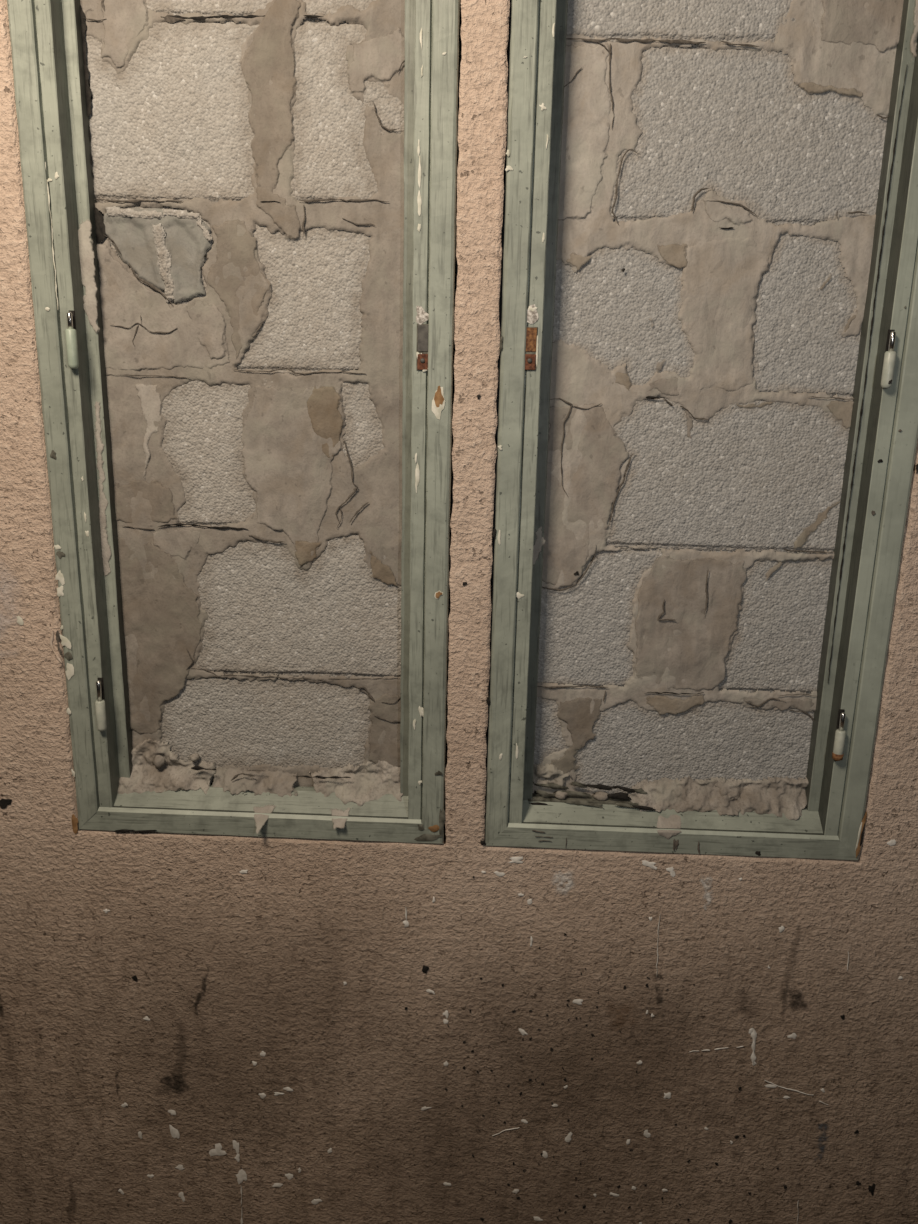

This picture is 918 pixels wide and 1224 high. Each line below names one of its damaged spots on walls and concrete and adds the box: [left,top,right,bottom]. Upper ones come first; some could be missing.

peeling [45,162,59,311]
spalling [103,206,212,304]
peeling [416,306,429,325]
peeling [54,545,65,597]
peeling [50,625,74,680]
peeling [529,782,656,810]
damp [748,1028,757,1063]